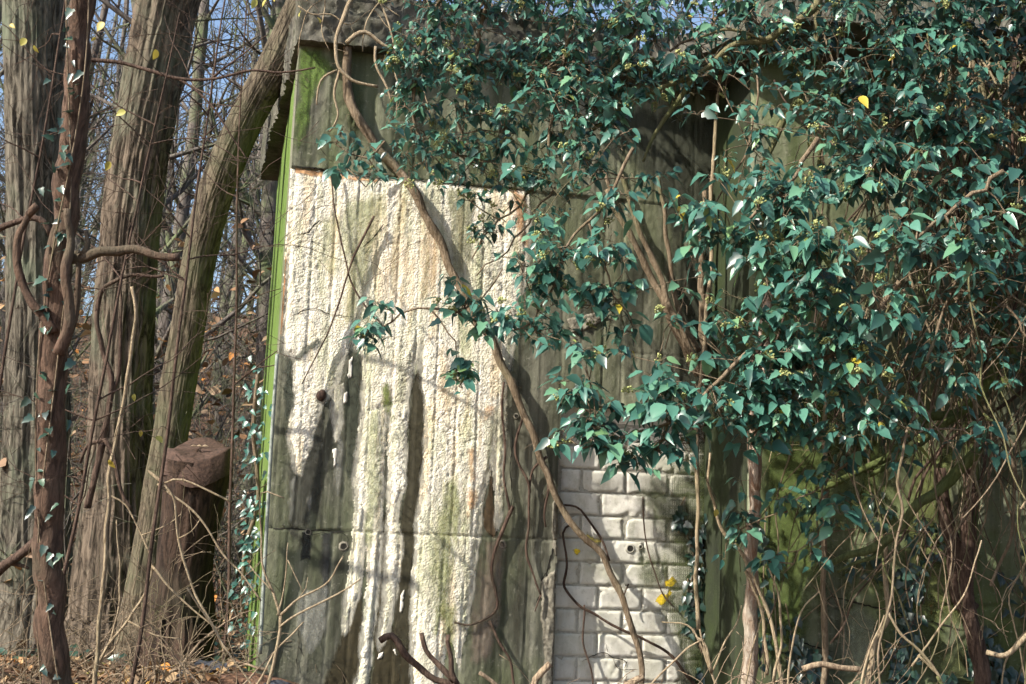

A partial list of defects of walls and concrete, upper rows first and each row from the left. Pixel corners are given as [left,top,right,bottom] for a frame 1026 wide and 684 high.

water stain [283,114,532,684]